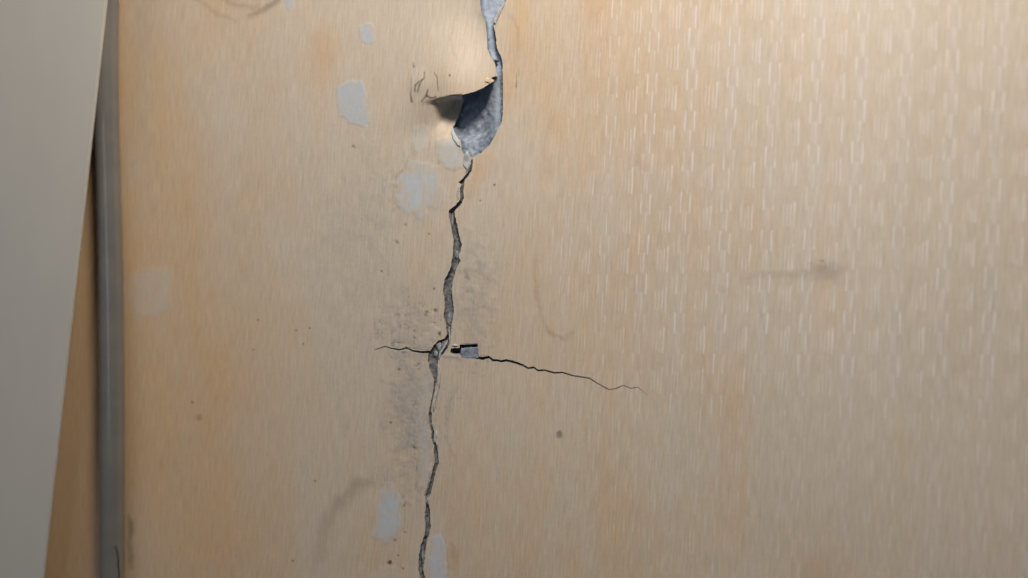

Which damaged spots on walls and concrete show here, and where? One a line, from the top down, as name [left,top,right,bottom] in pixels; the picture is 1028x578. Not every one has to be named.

peeling [334,77,372,129]
flaking render [432,0,506,174]
crack [375,159,647,578]
peeling [367,481,407,550]
peeling [424,532,449,578]